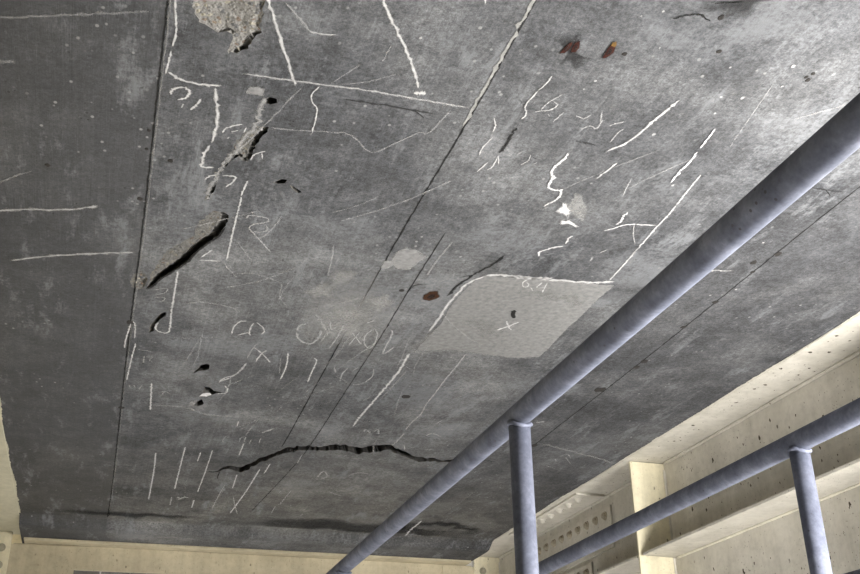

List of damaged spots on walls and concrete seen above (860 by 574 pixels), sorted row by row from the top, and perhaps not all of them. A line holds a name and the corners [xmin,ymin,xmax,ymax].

spalling [192,0,265,53]
rust [560,41,580,54]
spalling [204,87,270,201]
spalling [130,211,229,289]
crack [208,440,452,479]